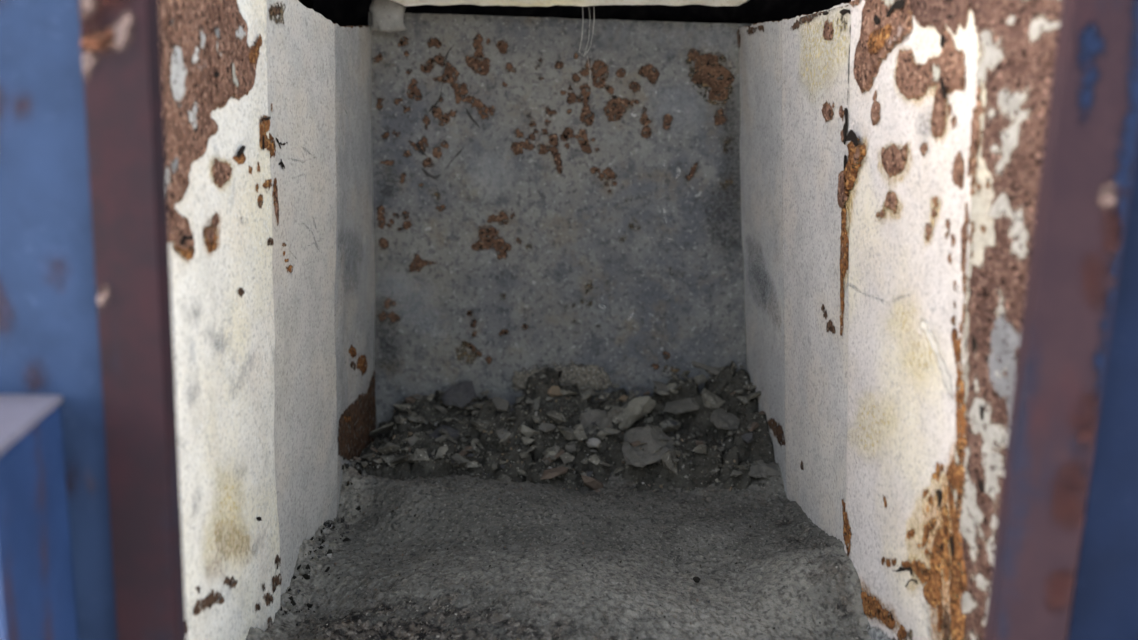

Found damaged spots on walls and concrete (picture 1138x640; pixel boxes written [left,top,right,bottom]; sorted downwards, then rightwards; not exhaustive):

rust [159,0,263,261]
rust [376,33,516,184]
rust [511,53,673,193]
rust [686,48,734,126]
rust [377,205,412,250]
rust [409,254,435,272]
rust [471,209,532,260]
rust [821,0,1062,640]
rust [338,345,376,461]
rust [255,554,282,627]